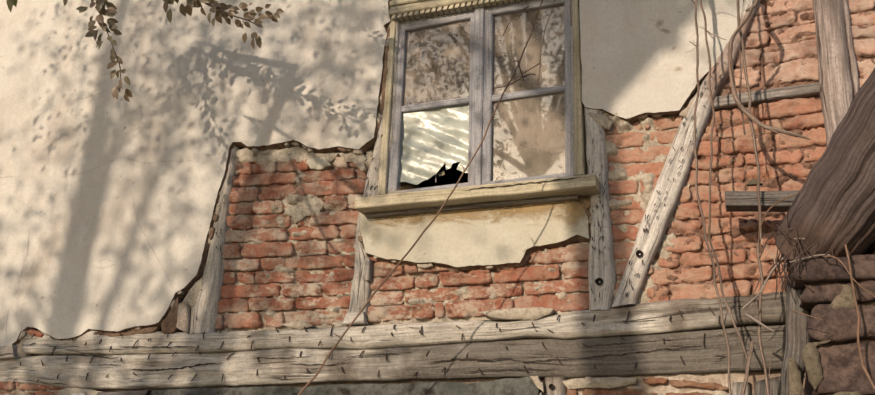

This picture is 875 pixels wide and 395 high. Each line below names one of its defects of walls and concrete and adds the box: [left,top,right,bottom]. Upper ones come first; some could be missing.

flaking render [12,0,393,345]
flaking render [679,94,697,118]